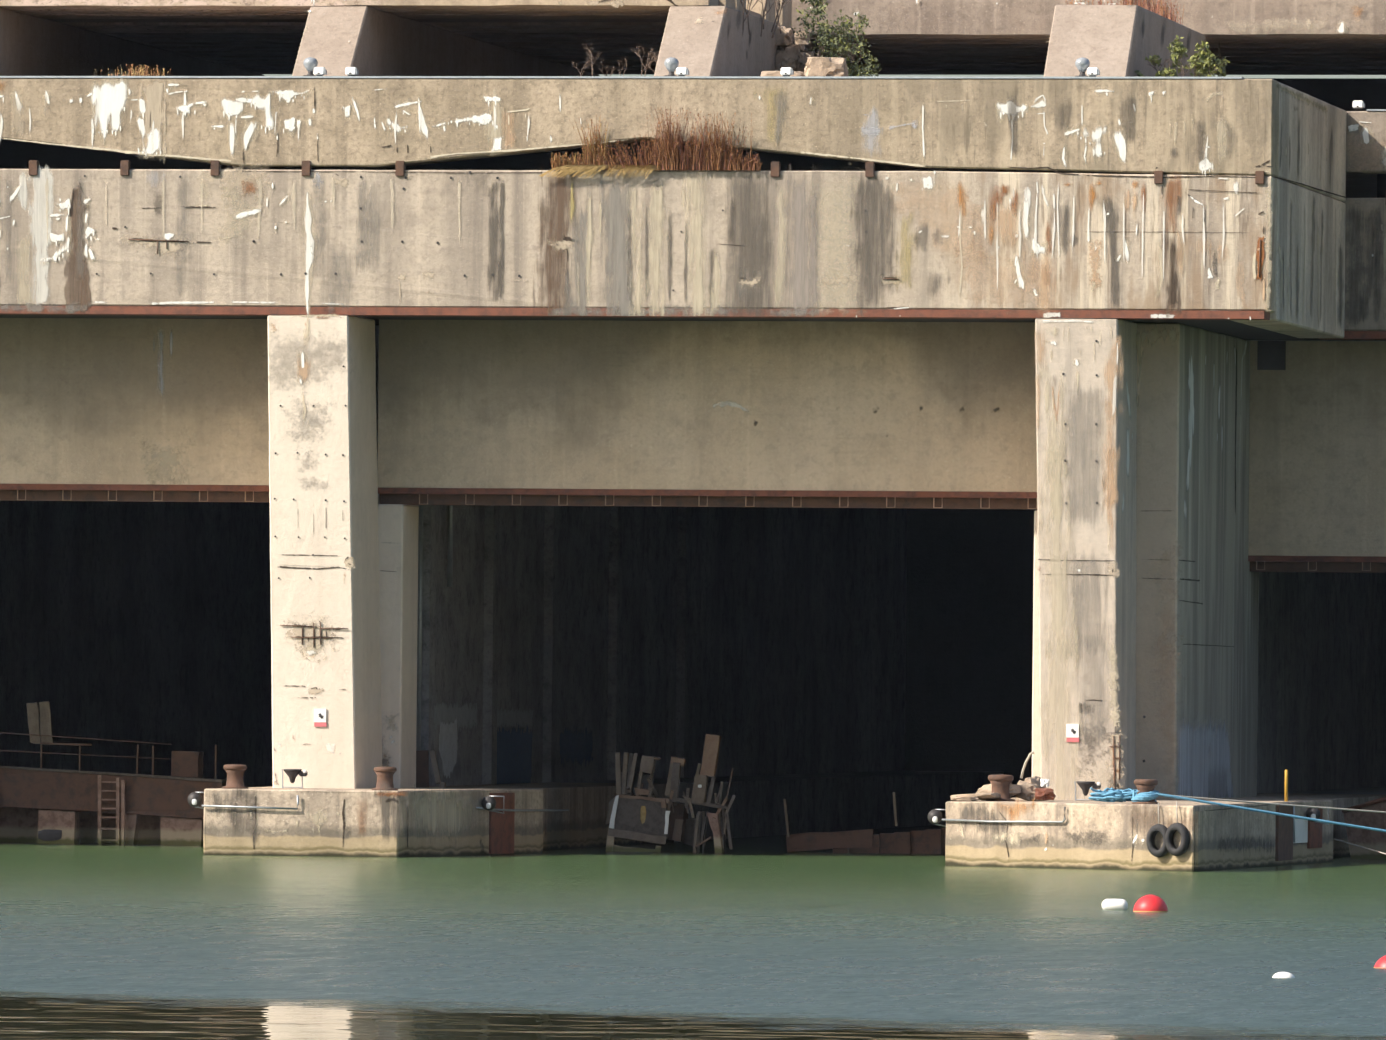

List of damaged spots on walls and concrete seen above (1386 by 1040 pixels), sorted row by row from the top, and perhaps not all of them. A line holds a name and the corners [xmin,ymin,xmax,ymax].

water stain [0,168,105,314]
water stain [540,169,817,317]
water stain [801,100,970,304]
rust [990,185,1018,240]
water stain [942,183,1144,306]
water stain [984,91,1165,165]
water stain [1198,123,1244,289]
water stain [1265,190,1386,325]
water stain [1126,213,1184,476]
water stain [1184,354,1206,513]
water stain [1040,312,1112,800]
spalling [280,620,349,663]